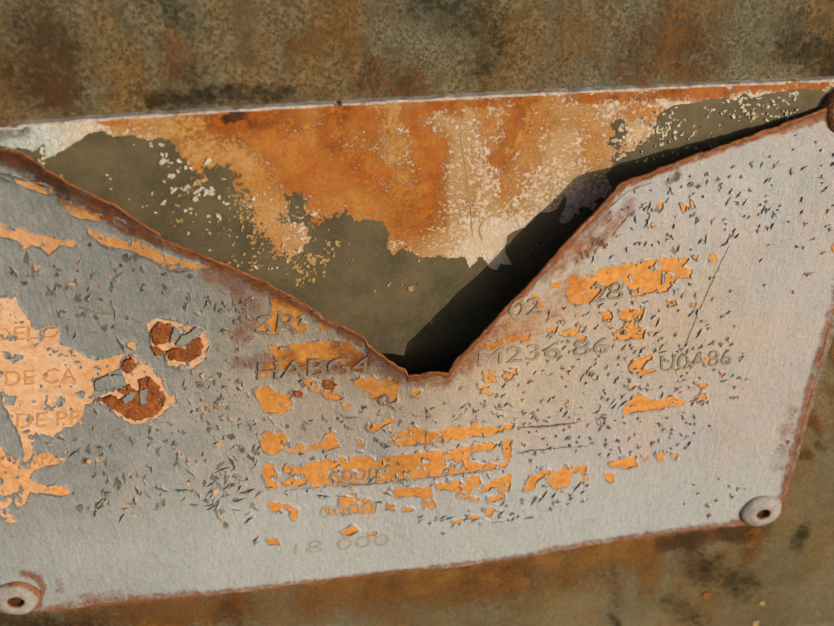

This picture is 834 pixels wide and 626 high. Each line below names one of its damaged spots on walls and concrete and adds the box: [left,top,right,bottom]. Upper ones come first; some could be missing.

corrosion [0,82,834,395]
peeling [0,89,829,538]
corrosion [94,314,212,427]
peeling [252,535,281,547]
corrosion [0,519,772,626]